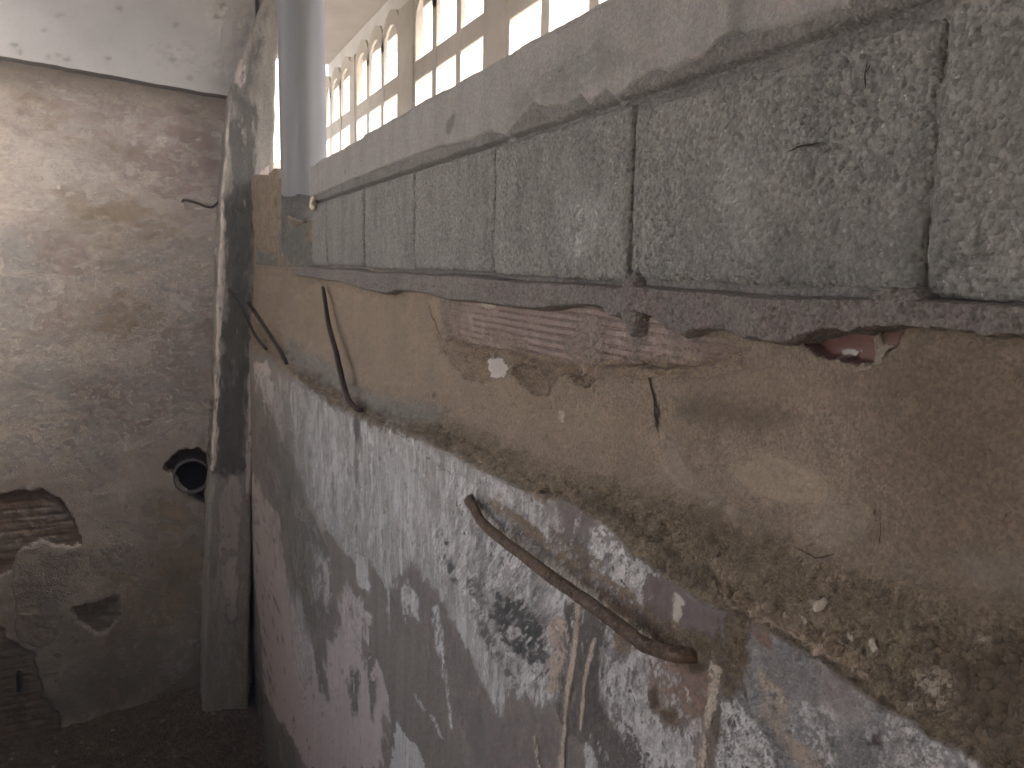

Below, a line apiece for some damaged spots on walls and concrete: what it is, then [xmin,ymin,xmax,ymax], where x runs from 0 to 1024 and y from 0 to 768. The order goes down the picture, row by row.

spalling [439,297,741,397]
spalling [804,330,905,371]
crack [648,368,660,439]
spalling [0,488,82,574]
damp [284,338,1024,768]
spalling [72,594,119,633]
rust [478,499,751,727]
spalling [0,626,61,739]